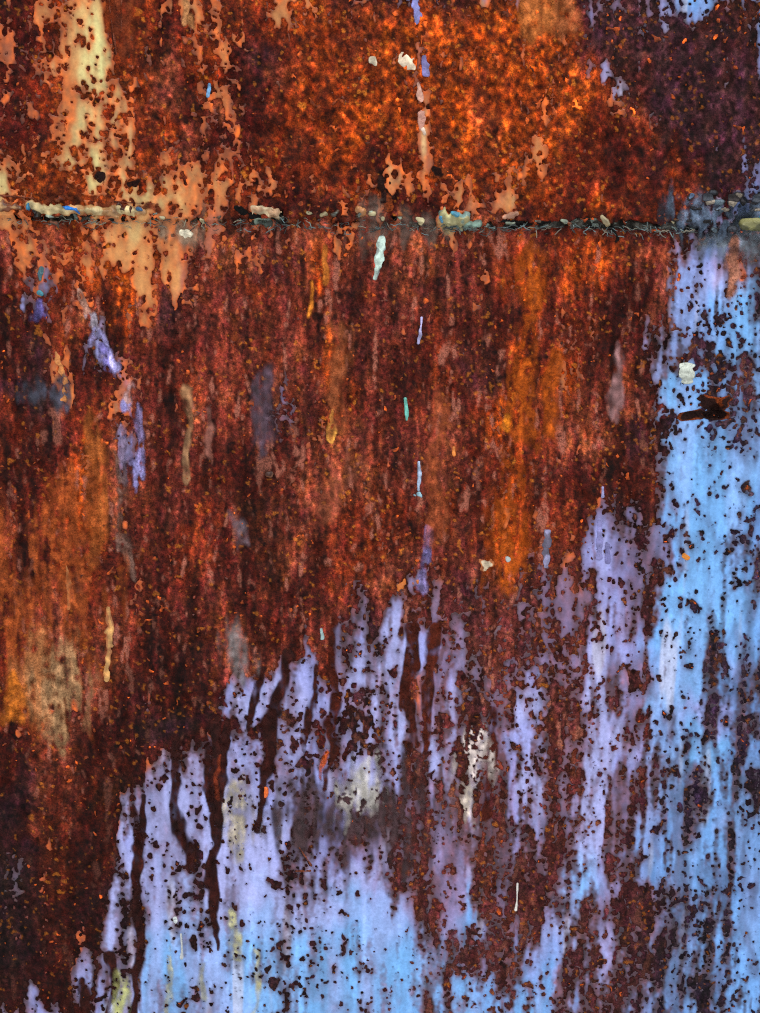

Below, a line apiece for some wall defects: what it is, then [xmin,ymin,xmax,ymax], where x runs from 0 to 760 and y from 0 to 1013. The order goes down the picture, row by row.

corrosion [0,0,82,231]
corrosion [104,0,206,186]
peeling [265,0,333,42]
peeling [313,0,760,268]
corrosion [715,0,760,49]
peeling [0,0,291,477]
peeling [39,673,82,741]
corrosion [233,642,301,834]
corrosion [301,664,318,747]
corrosion [589,643,654,715]
peeling [39,837,53,906]
corrosion [164,715,231,951]